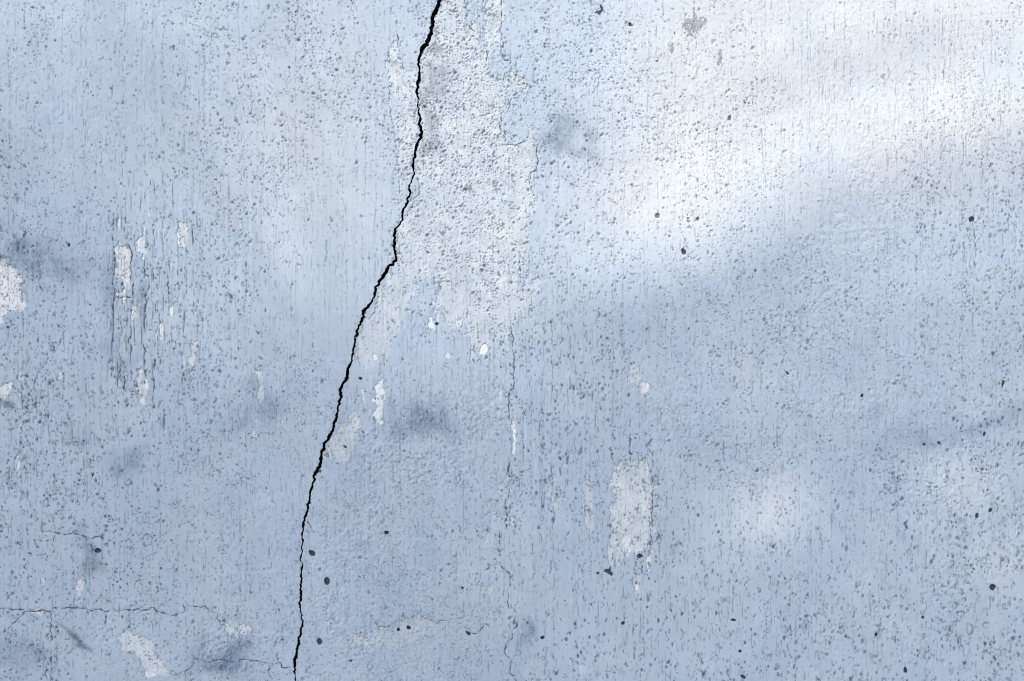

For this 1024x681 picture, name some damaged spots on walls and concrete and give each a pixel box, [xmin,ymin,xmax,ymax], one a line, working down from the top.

spalling [0,256,26,324]
peeling [113,212,150,362]
crack [179,0,508,681]
peeling [324,0,543,464]
crack [41,526,101,541]
crack [0,605,227,681]
peeling [117,629,169,680]
crack [486,456,518,680]
peeling [607,440,658,592]